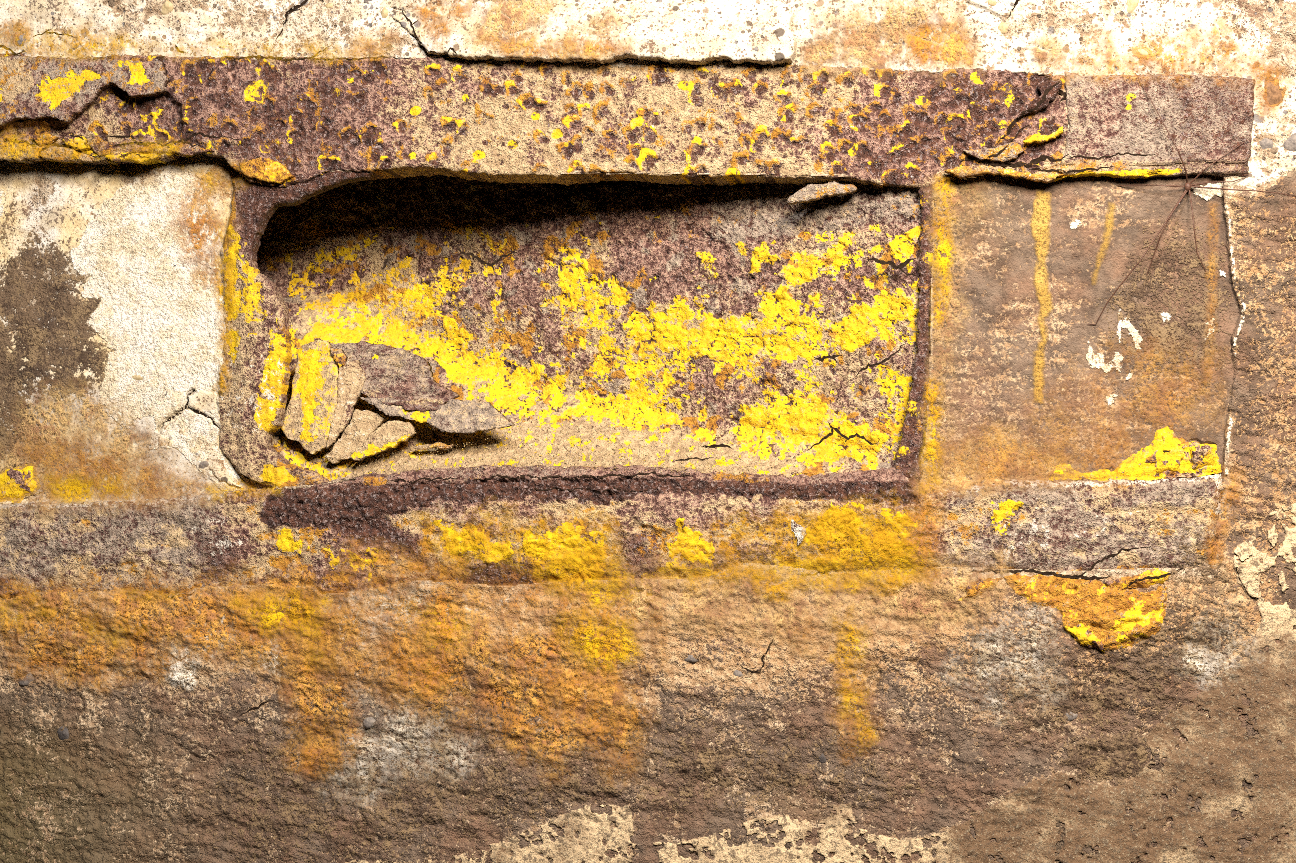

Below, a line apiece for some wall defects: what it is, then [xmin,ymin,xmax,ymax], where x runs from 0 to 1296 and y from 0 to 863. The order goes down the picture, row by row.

crack [222,0,460,61]
crack [0,132,238,158]
water stain [0,186,115,462]